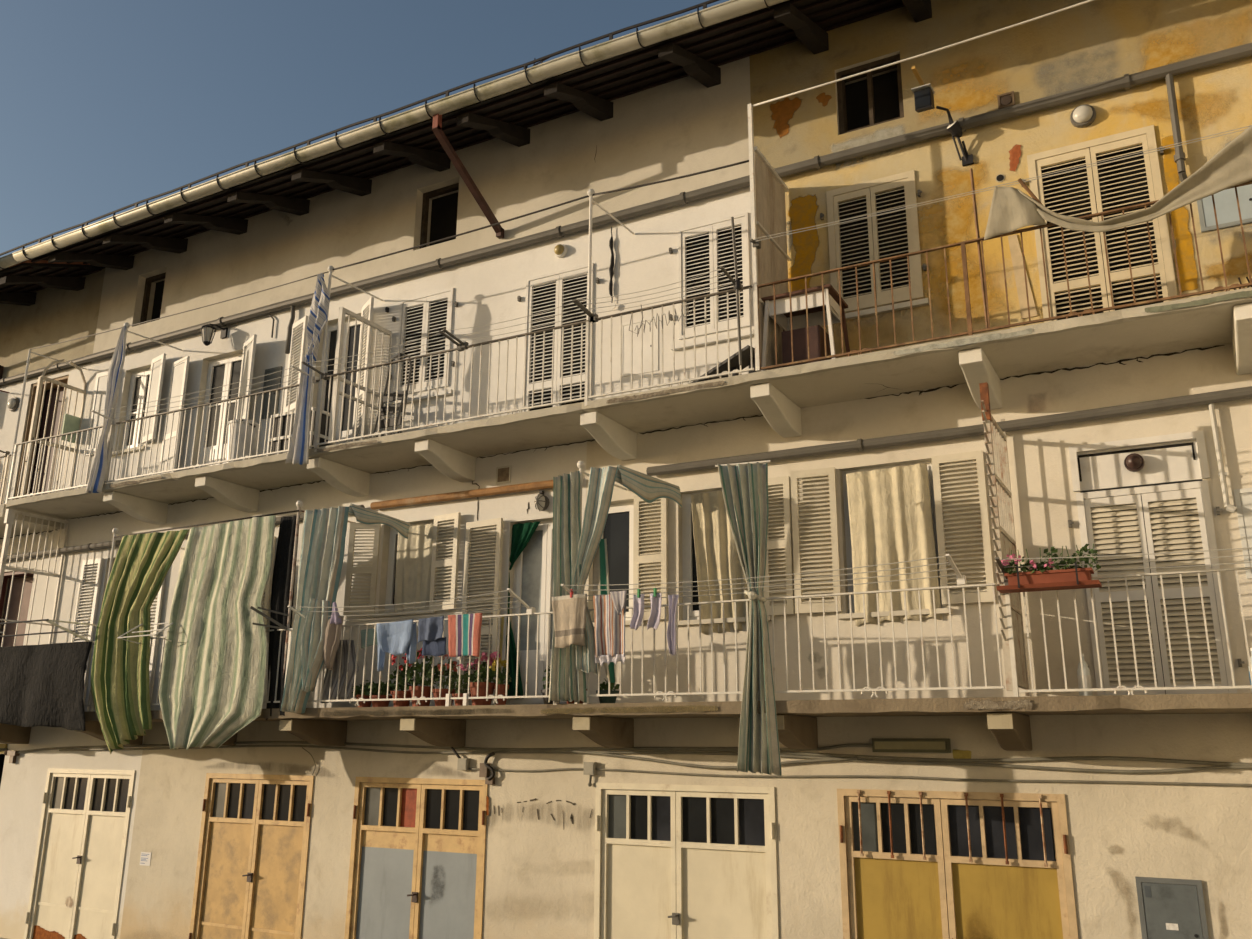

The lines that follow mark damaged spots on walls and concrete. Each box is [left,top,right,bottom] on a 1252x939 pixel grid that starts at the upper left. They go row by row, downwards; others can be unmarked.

peeling [770,93,832,138]
flaking render [1009,144,1021,171]